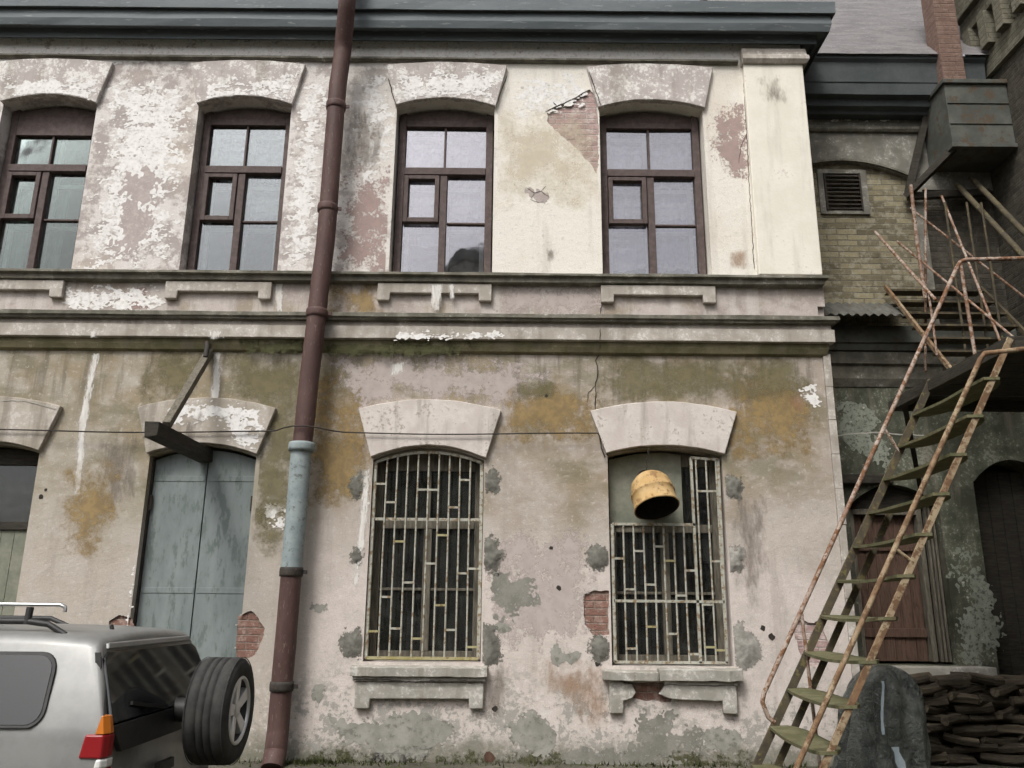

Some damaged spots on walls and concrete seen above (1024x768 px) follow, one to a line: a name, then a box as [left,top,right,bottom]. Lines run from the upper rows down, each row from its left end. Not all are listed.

peeling [0,44,334,269]
peeling [336,42,740,272]
peeling [708,103,749,179]
crack [739,83,755,270]
leakage [64,353,131,555]
peeling [394,329,505,341]
leakage [519,382,554,397]
crack [587,277,603,410]
flaking render [234,611,265,659]
leakage [488,571,541,624]
peeling [485,528,610,667]
leakage [626,708,710,765]